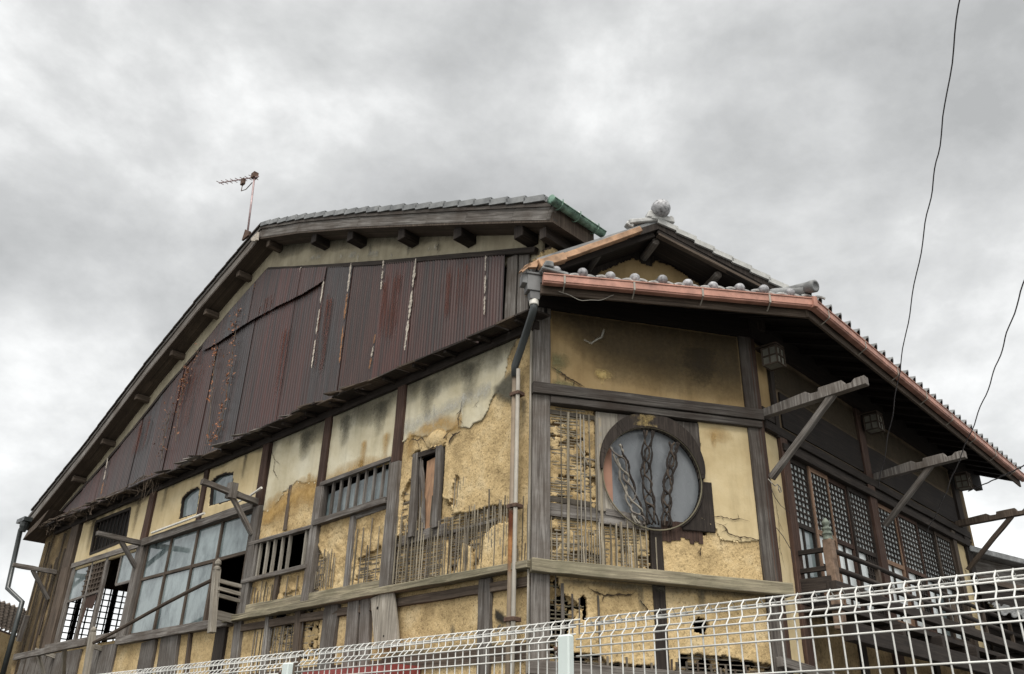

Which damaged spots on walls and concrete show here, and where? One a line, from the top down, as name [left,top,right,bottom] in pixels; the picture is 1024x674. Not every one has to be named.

flaking render [259,481,317,539]
flaking render [395,431,433,538]
water stain [340,339,515,432]
water stain [405,372,525,445]
flaking render [441,335,530,574]
crack [713,502,784,562]